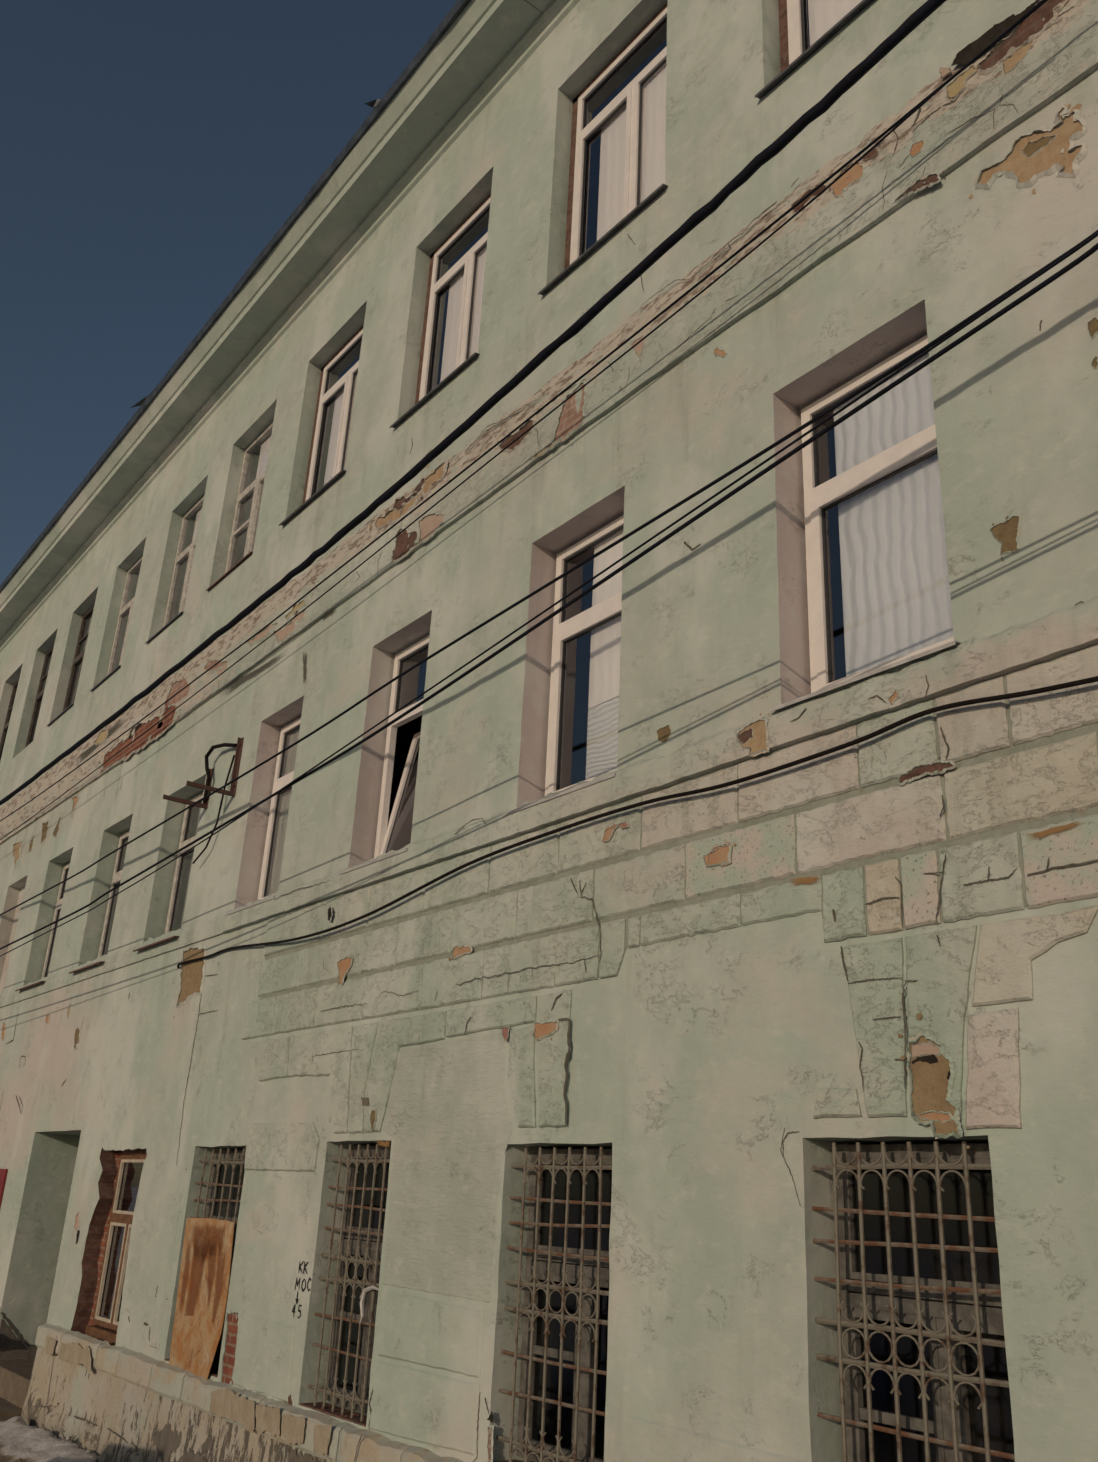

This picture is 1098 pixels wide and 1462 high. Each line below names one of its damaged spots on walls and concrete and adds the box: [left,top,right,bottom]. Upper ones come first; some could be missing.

peeling [969,103,1087,199]
flaking render [499,379,587,460]
flaking render [369,449,448,563]
peeling [989,514,1022,562]
flaking render [94,658,229,773]
peeling [737,713,770,757]
flaking render [898,757,956,786]
crack [925,675,950,817]
peeling [173,945,207,1018]
crack [832,854,1098,1092]
peeling [898,1012,970,1149]
flaking render [487,1411,496,1462]